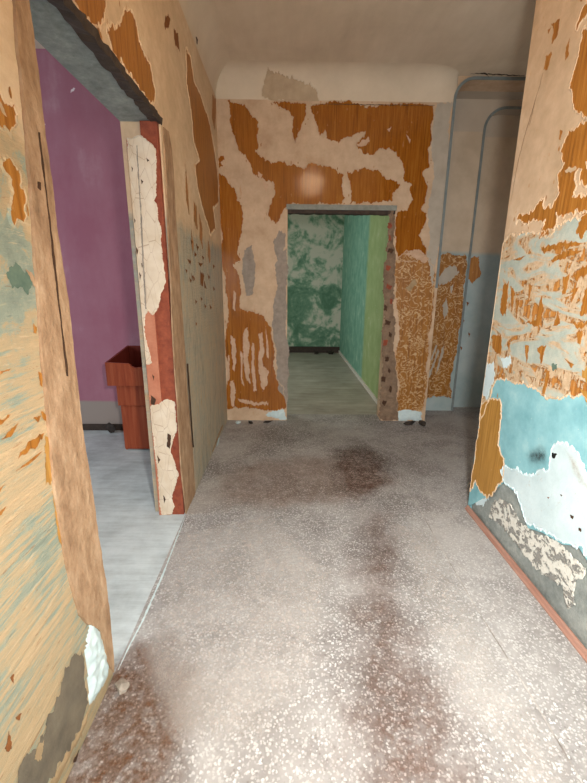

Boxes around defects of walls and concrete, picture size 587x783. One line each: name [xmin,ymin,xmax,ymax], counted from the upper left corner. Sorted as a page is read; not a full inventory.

peeling [0,87,18,139]
peeling [73,0,156,106]
peeling [514,0,587,239]
peeling [127,135,166,365]
peeling [164,15,287,411]
peeling [227,64,481,421]
peeling [0,414,18,440]
peeling [16,433,52,485]
peeling [150,396,179,515]
flaking render [469,394,587,649]
flaking render [18,652,89,783]